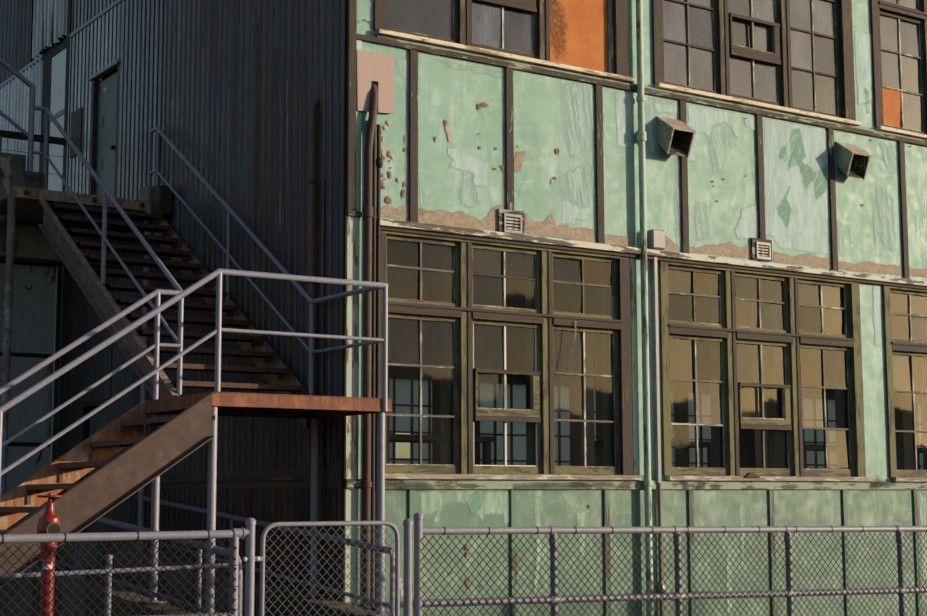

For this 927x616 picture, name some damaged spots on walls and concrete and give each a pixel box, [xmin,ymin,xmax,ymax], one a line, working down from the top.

flaking render [380,120,506,232]
flaking render [524,213,632,247]
flaking render [663,236,751,259]